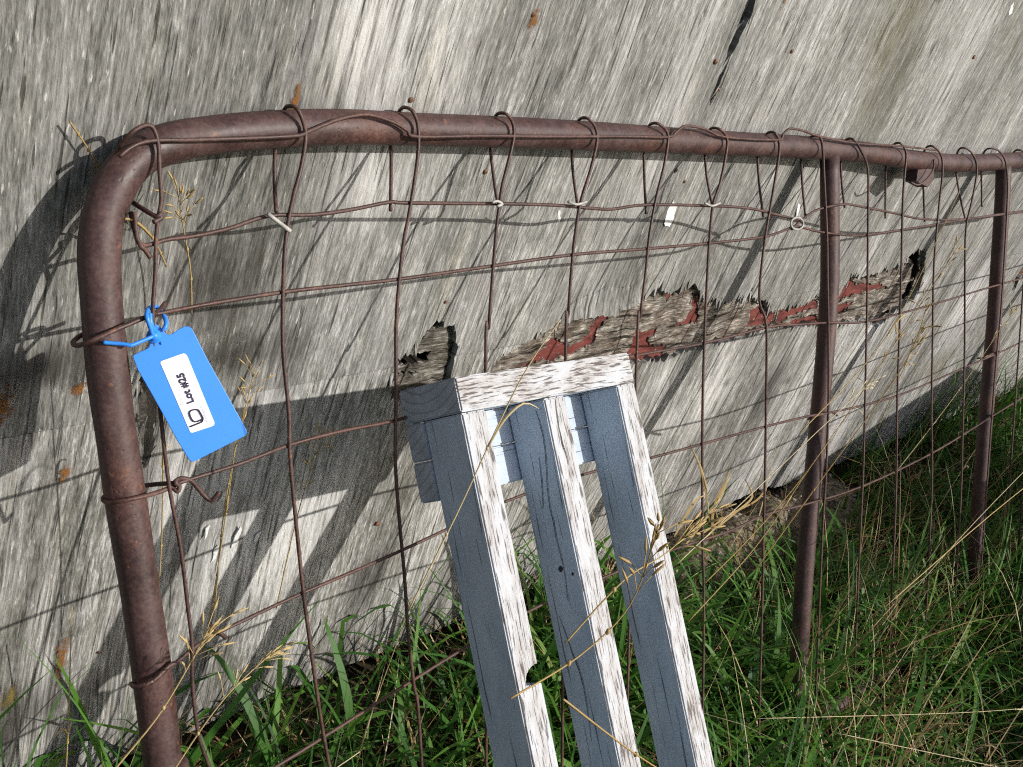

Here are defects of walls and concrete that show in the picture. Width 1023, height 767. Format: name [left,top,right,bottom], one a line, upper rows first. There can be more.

crack [709,0,757,105]